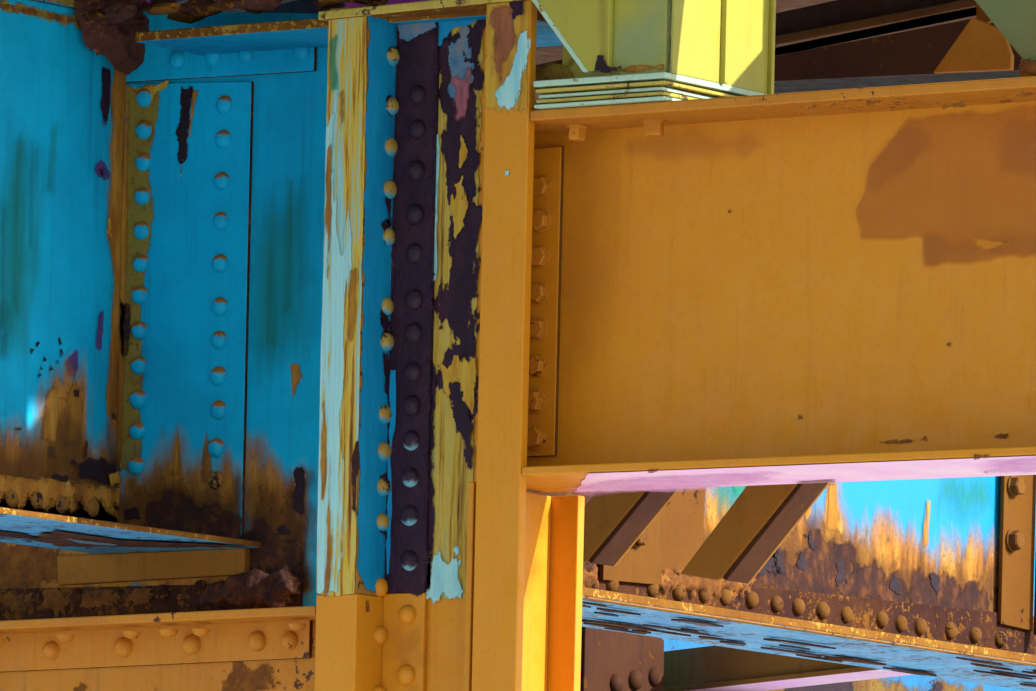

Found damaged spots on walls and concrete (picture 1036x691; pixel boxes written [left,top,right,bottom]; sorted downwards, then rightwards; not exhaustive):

corrosion [0,0,82,29]
peeling [175,86,198,173]
corrosion [0,67,311,617]
peeling [317,36,360,597]
peeling [385,19,486,597]
peeling [0,530,246,548]
corrosion [661,482,999,612]
peeling [582,601,746,646]
corrosion [221,661,281,691]
peeling [761,638,943,691]
corrosion [852,678,918,691]
corrosion [932,680,983,691]